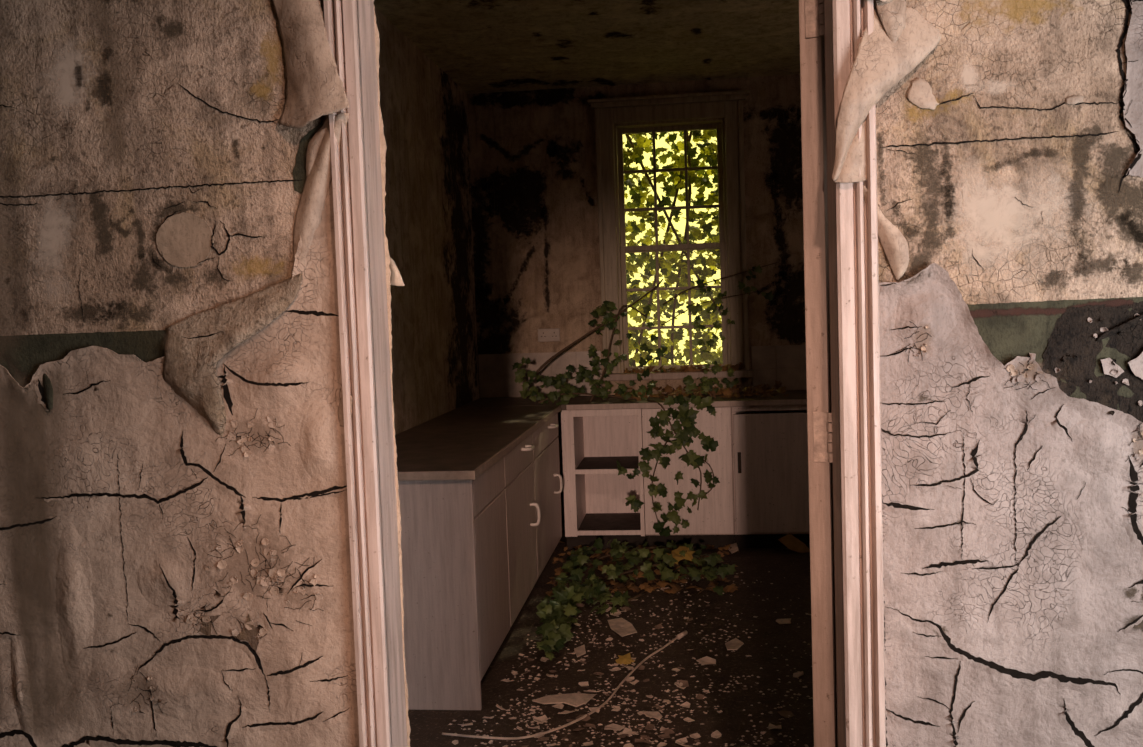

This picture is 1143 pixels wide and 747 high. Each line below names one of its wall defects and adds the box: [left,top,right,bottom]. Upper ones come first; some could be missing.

water stain [51,48,113,110]
water stain [62,189,198,330]
crack [0,180,300,281]
mould [439,70,616,408]
mould [743,105,806,345]
water stain [877,125,1143,287]
crack [882,0,1143,192]
crack [0,431,349,747]
peeling [0,180,360,747]
crack [217,364,310,417]
peeling [878,263,1143,747]
crack [881,376,1143,747]